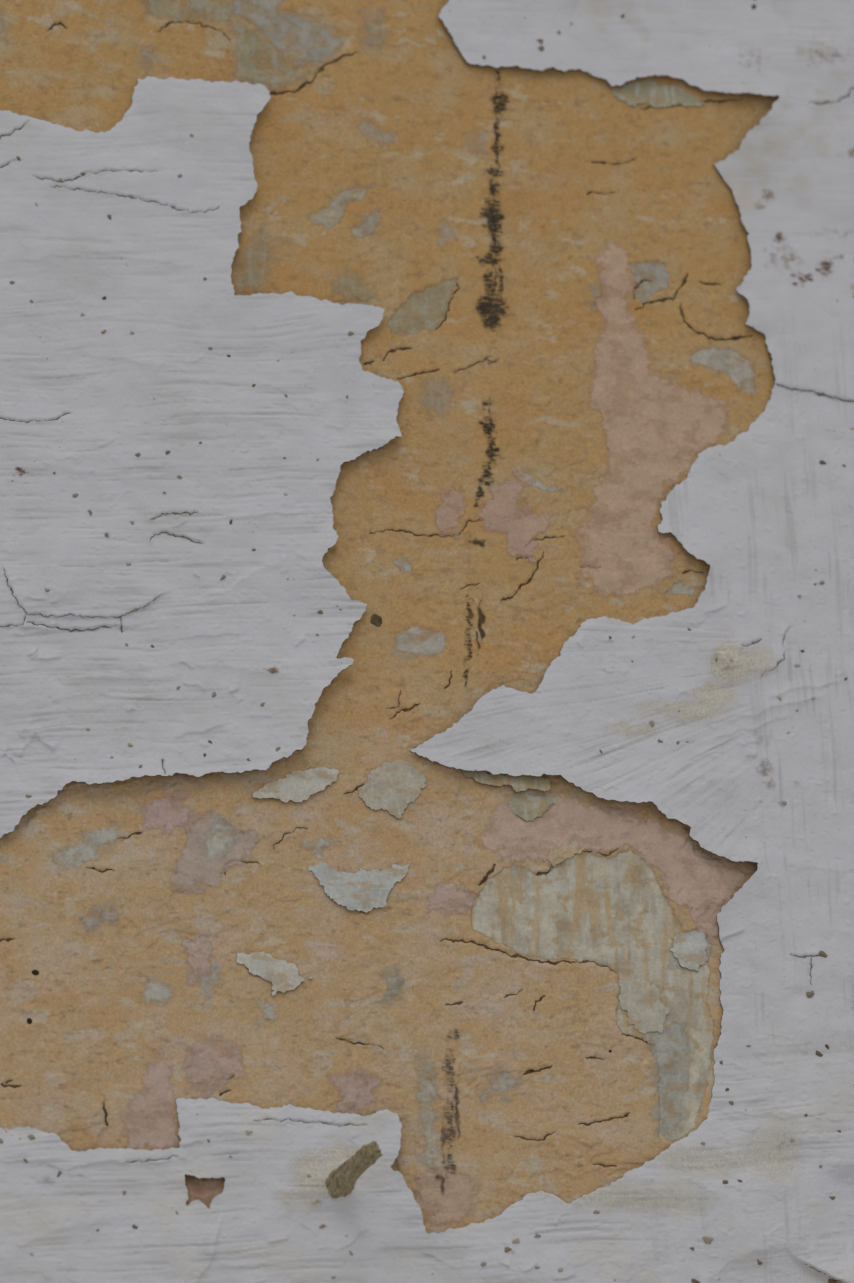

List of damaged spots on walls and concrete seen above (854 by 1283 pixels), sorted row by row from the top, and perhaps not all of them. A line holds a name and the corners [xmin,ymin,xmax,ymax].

spalling [231,0,342,62]
peeling [577,242,727,597]
peeling [0,76,404,839]
peeling [478,466,548,563]
crack [460,535,565,600]
crack [0,570,159,632]
peeling [358,760,426,819]
peeling [308,863,410,913]
peeling [482,774,757,943]
peeling [236,951,304,996]
spalling [471,849,715,1142]
spalling [185,1175,225,1208]